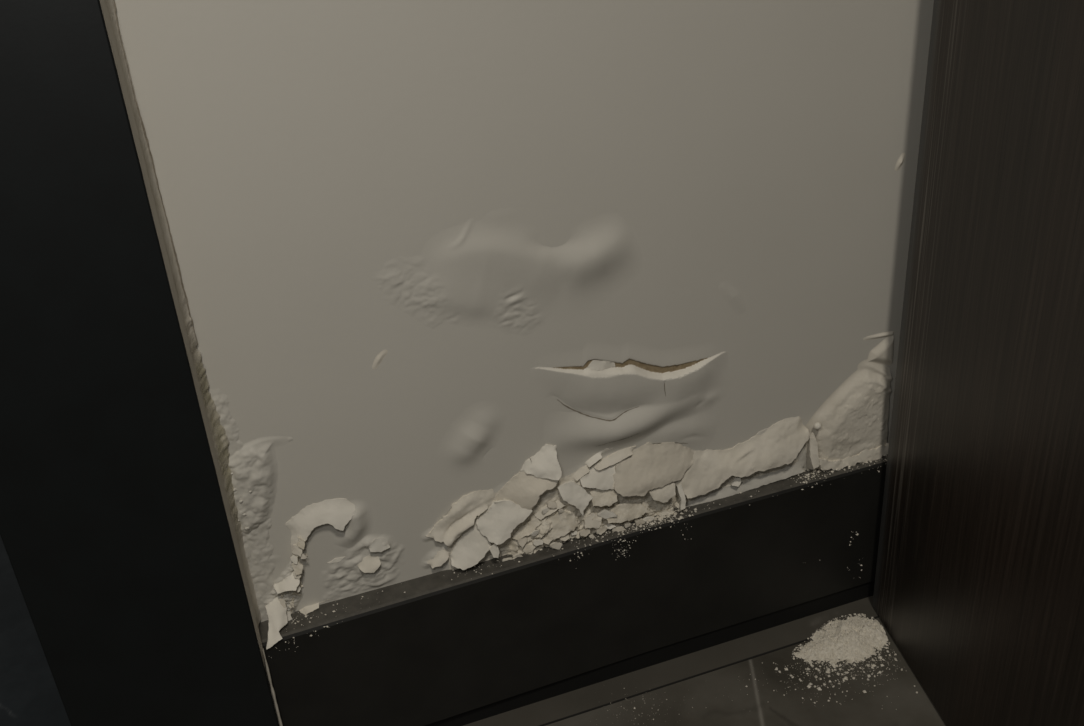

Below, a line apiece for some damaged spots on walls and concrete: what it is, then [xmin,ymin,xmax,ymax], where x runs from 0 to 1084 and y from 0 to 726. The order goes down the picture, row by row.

peeling [209,388,244,457]
flaking render [420,416,821,570]
crack [531,341,727,396]
peeling [243,498,390,649]